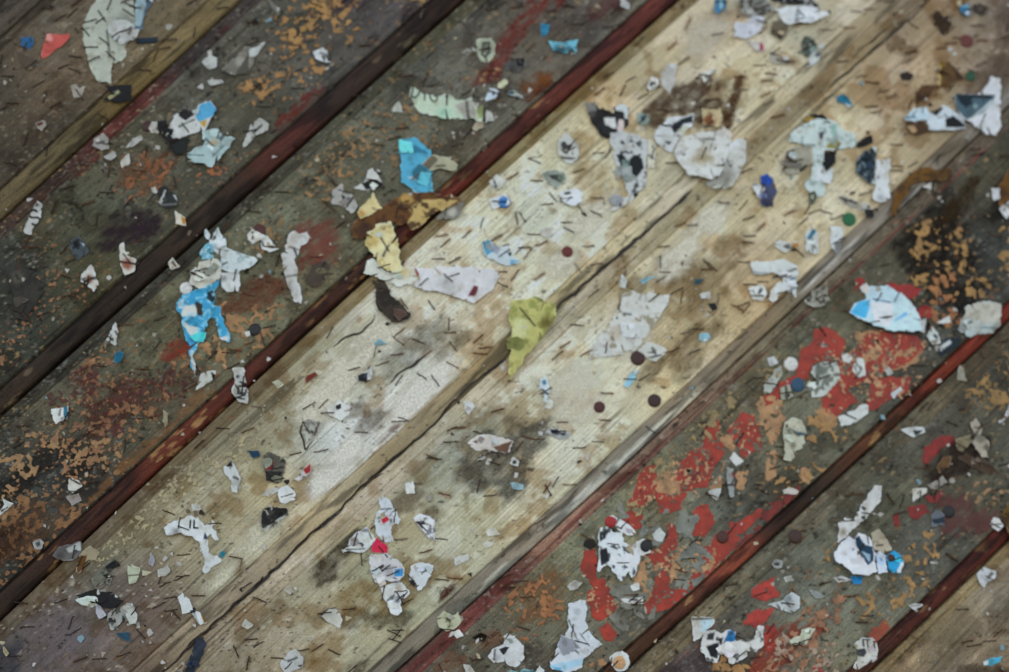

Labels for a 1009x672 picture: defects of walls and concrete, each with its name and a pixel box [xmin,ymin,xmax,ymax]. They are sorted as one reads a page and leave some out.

peeling [237,0,362,114]
peeling [0,257,101,366]
peeling [0,301,285,586]
peeling [575,216,1009,642]
peeling [500,574,566,642]
peeling [711,531,945,672]